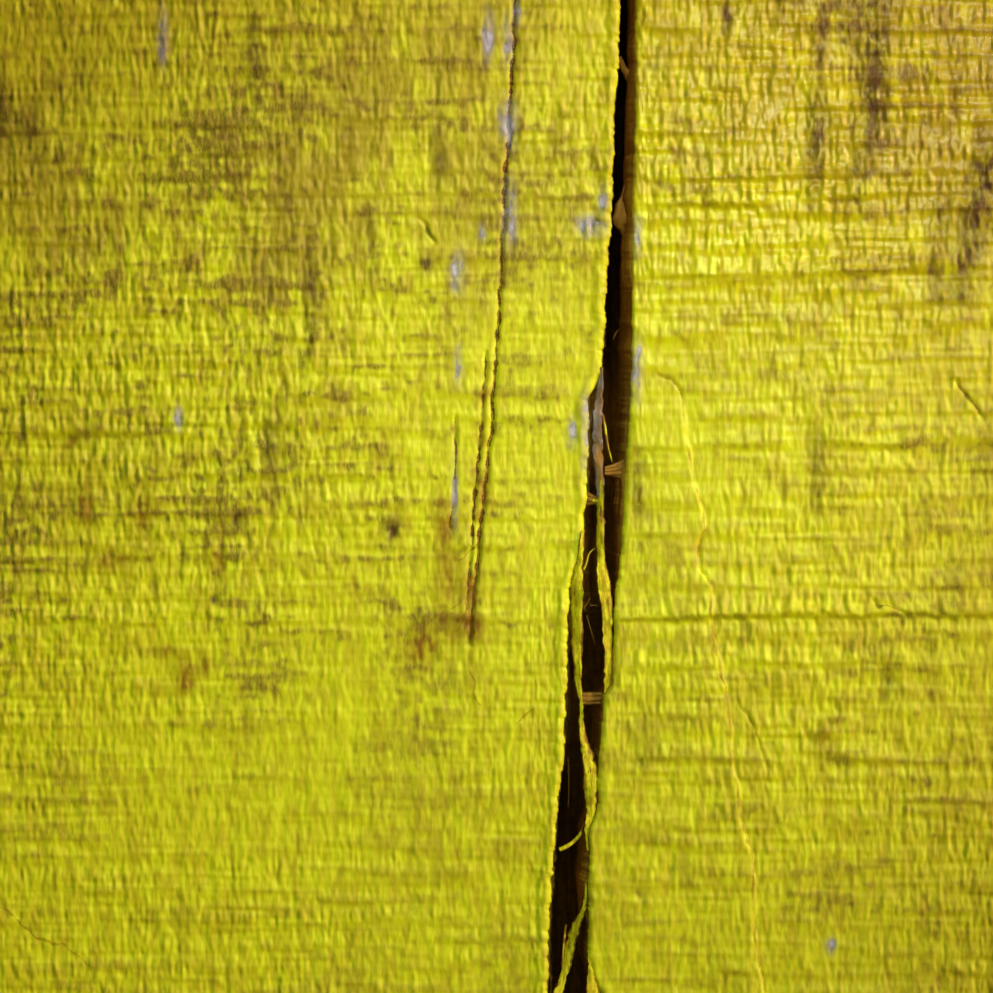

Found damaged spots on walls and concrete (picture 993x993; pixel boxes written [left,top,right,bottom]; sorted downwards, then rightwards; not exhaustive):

crack [449,0,517,641]
crack [547,0,636,993]